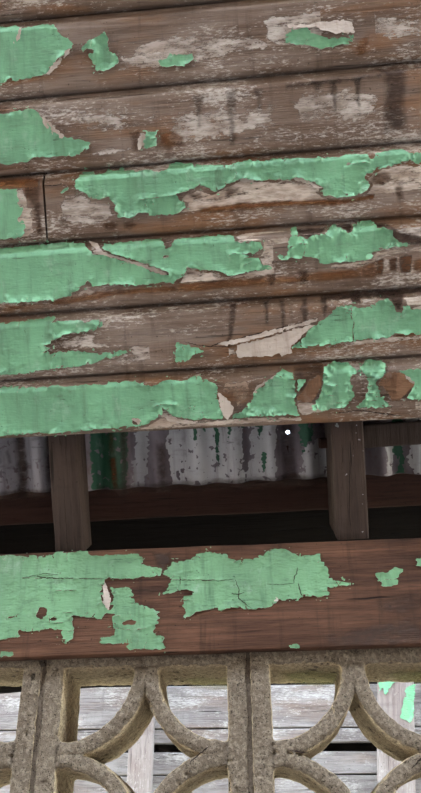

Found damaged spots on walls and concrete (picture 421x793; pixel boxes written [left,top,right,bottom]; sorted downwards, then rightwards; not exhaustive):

peeling [0,11,355,86]
peeling [374,13,421,39]
peeling [0,106,160,165]
leakage [309,70,404,129]
peeling [61,148,421,224]
peeling [0,188,421,495]
peeling [0,547,354,653]
peeling [375,567,403,587]